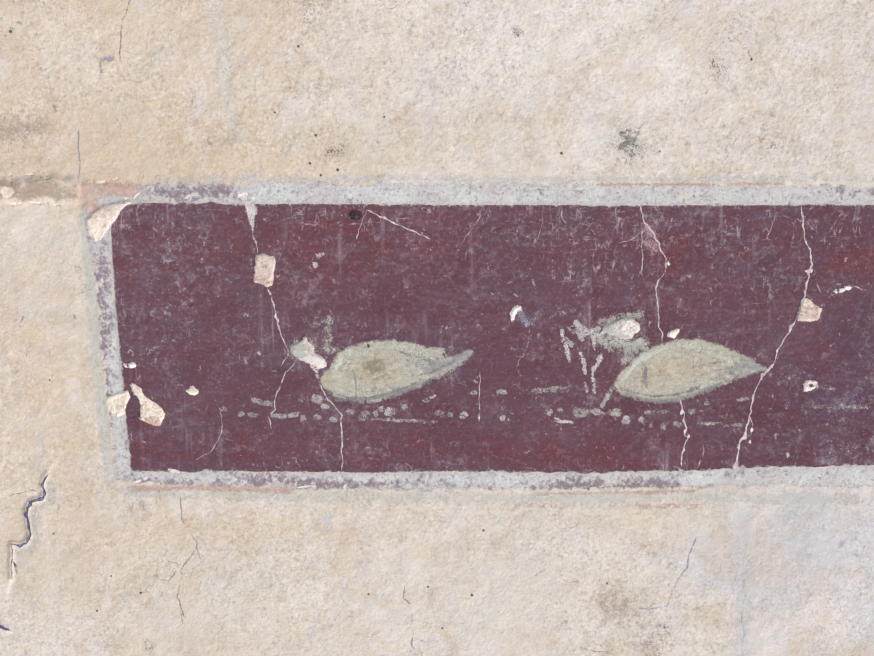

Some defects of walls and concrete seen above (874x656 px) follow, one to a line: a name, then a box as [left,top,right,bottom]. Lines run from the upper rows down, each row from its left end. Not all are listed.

spalling [75,177,149,241]
spalling [253,254,276,287]
crack [267,288,295,425]
spalling [284,312,345,379]
crack [592,206,670,339]
crack [732,205,844,474]
spalling [795,298,822,321]
spalling [104,383,165,426]
crack [319,383,347,471]
crack [9,473,56,574]